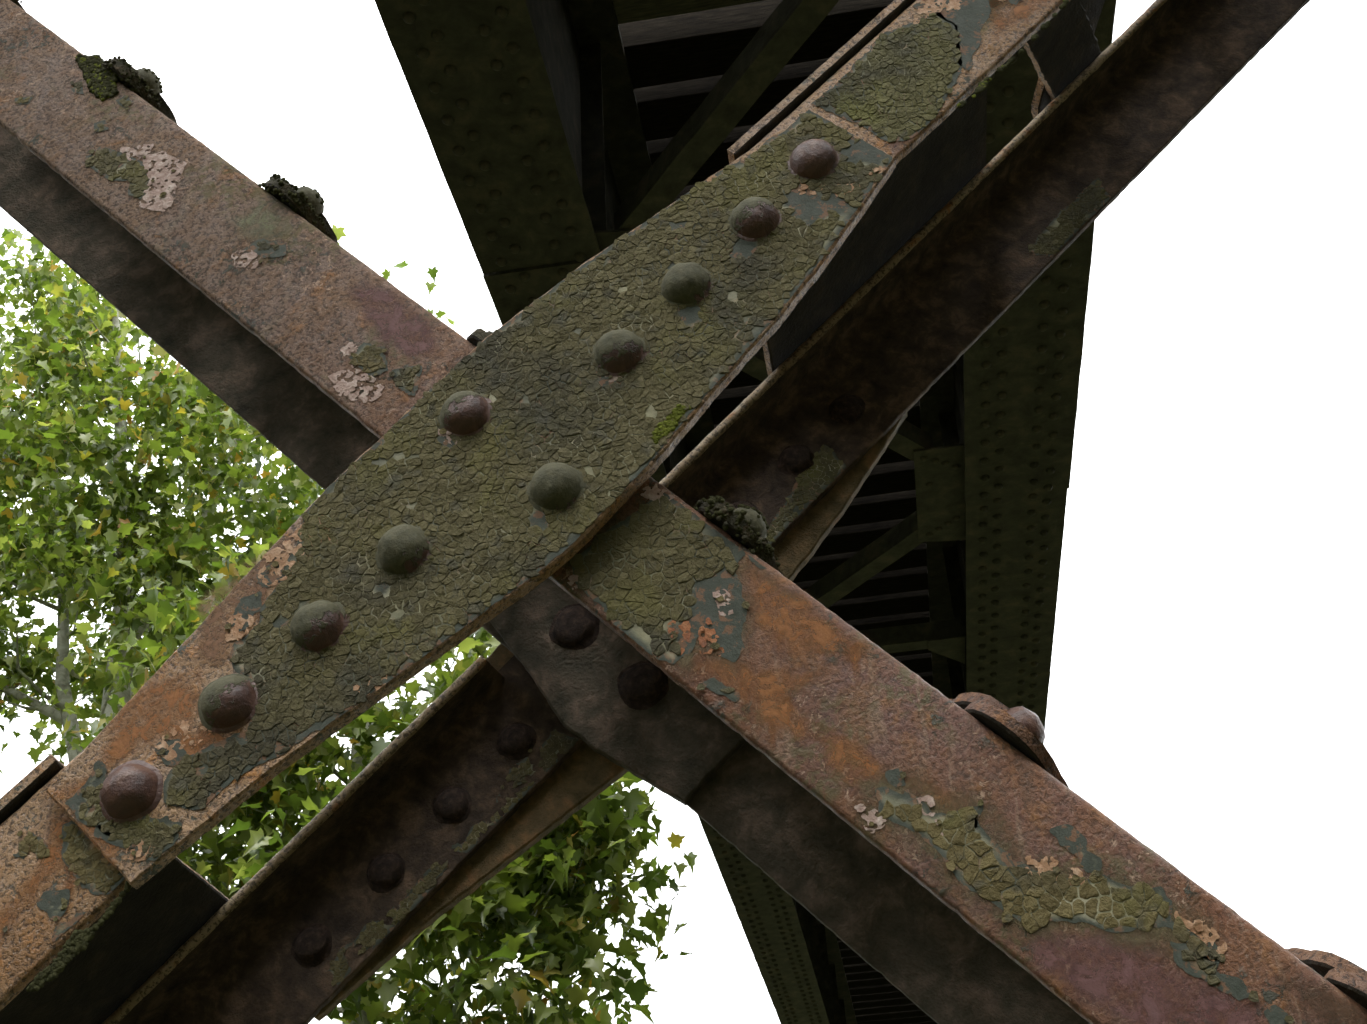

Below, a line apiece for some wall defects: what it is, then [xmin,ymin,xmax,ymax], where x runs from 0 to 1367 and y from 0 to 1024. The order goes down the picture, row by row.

peeling [1028,178,1111,257]
peeling [13,0,1019,942]
rust [103,681,239,764]
peeling [854,768,1294,1024]